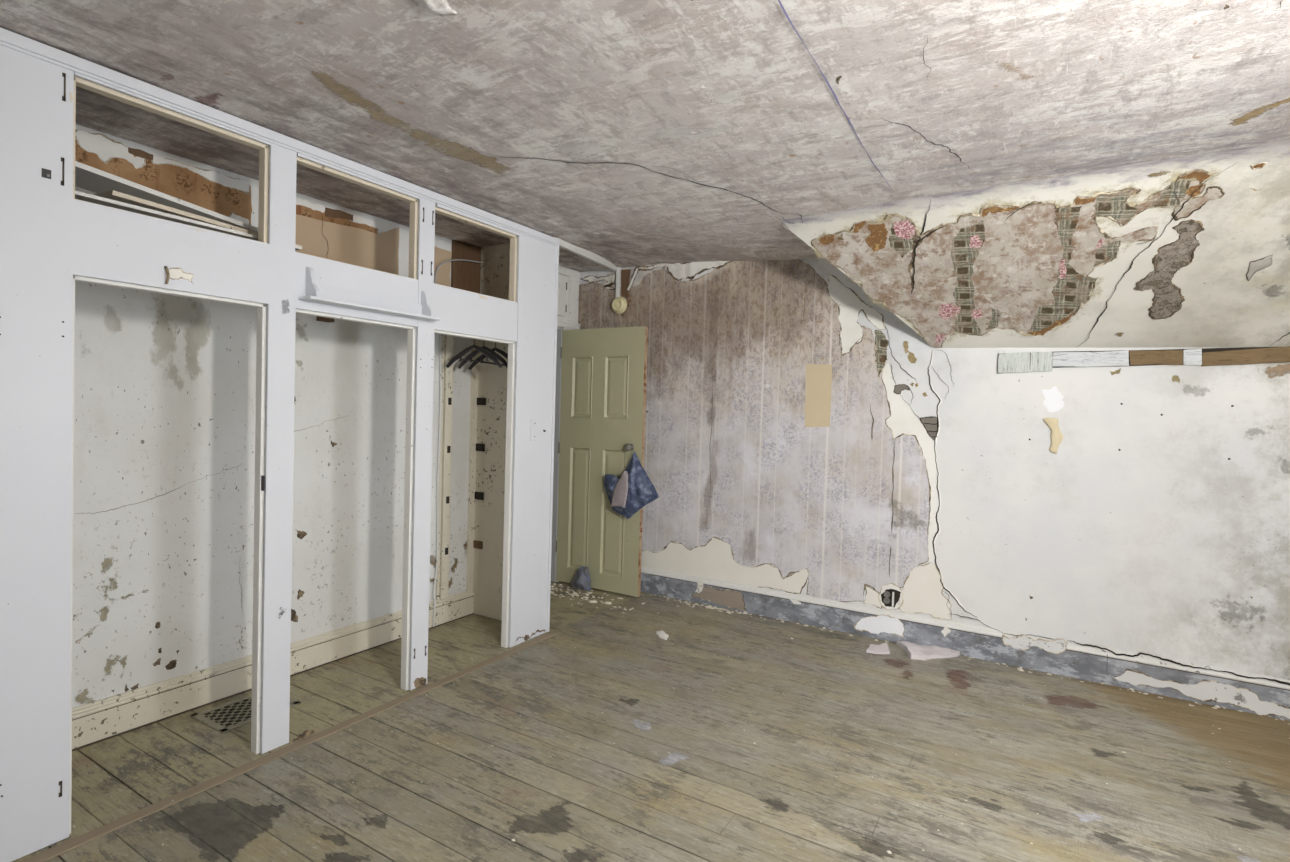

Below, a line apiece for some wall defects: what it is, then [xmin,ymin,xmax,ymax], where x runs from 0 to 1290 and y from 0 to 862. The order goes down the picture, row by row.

crack [1079,163,1236,346]
peeling [827,274,886,356]
spalling [903,341,917,363]
peeling [854,363,952,638]
crack [886,328,1290,686]
peeling [641,537,809,611]
peeling [1002,618,1068,654]
peeling [1113,669,1290,719]